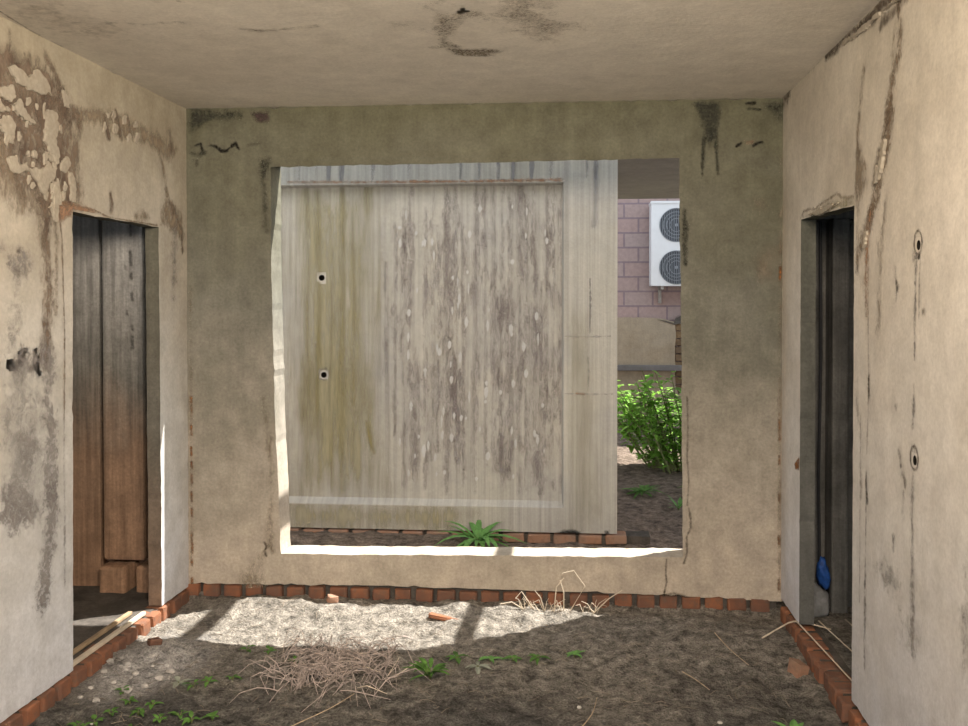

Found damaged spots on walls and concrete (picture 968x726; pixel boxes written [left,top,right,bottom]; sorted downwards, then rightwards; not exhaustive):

damp [440,12,494,56]
peeling [0,64,81,222]
damp [694,102,720,175]
crack [825,0,902,313]
damp [0,193,60,613]